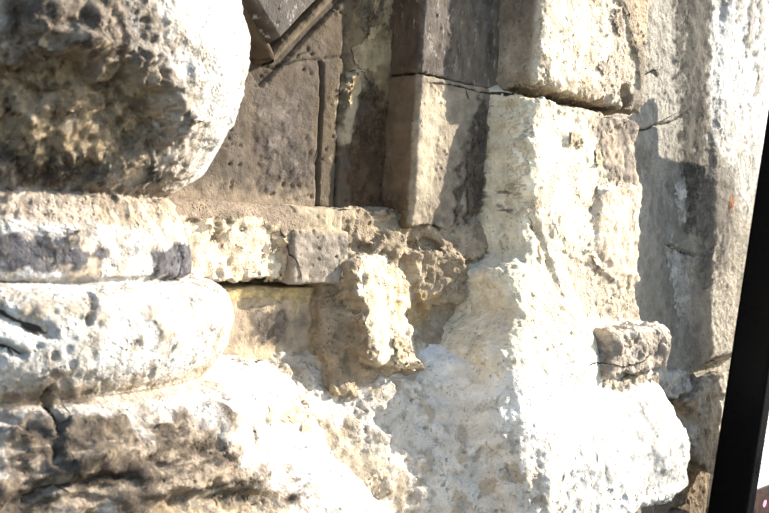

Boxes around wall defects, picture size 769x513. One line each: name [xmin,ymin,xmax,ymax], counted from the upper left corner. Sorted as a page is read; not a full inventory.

spalling [2,87,146,181]
spalling [153,92,211,164]
crack [638,113,679,131]
damp [0,230,109,279]
damp [151,242,192,281]
spalling [297,206,489,399]
crack [0,309,47,336]
crack [0,344,23,357]
crack [588,352,653,372]